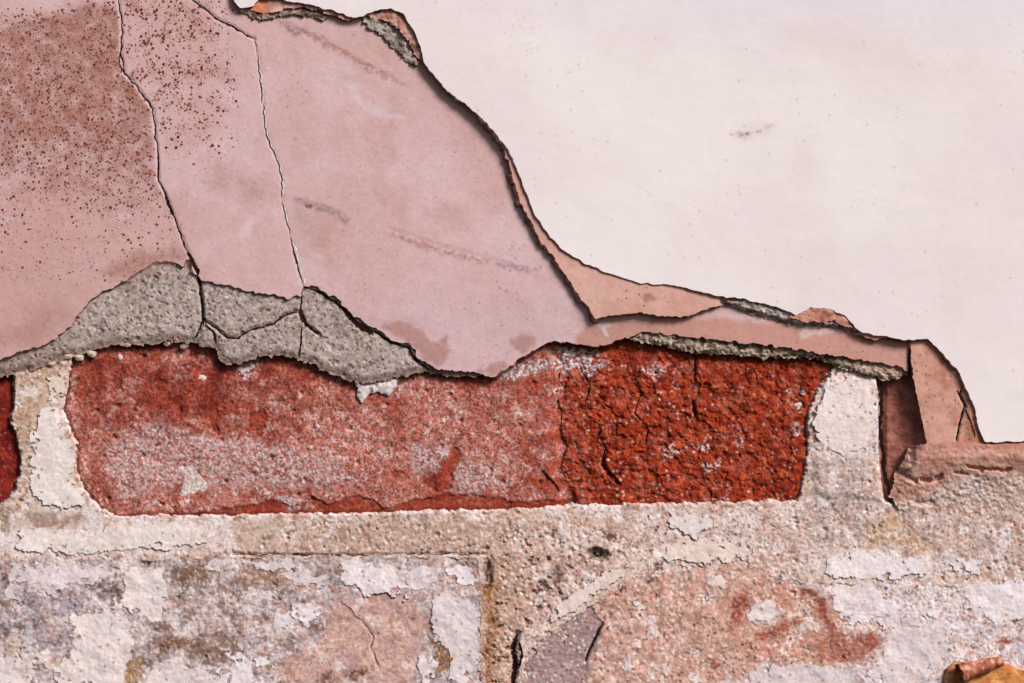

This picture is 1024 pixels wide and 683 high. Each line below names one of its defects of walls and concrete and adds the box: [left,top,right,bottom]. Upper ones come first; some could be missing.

flaking render [238,0,423,66]
crack [118,0,430,370]
flaking render [499,145,890,341]
spalling [0,260,481,510]
crack [541,440,565,491]
crack [557,352,591,408]
crack [597,430,619,484]
crack [632,380,649,445]
crack [692,355,700,418]
spalling [552,332,984,605]
peeling [0,523,208,683]
peeling [204,555,482,683]